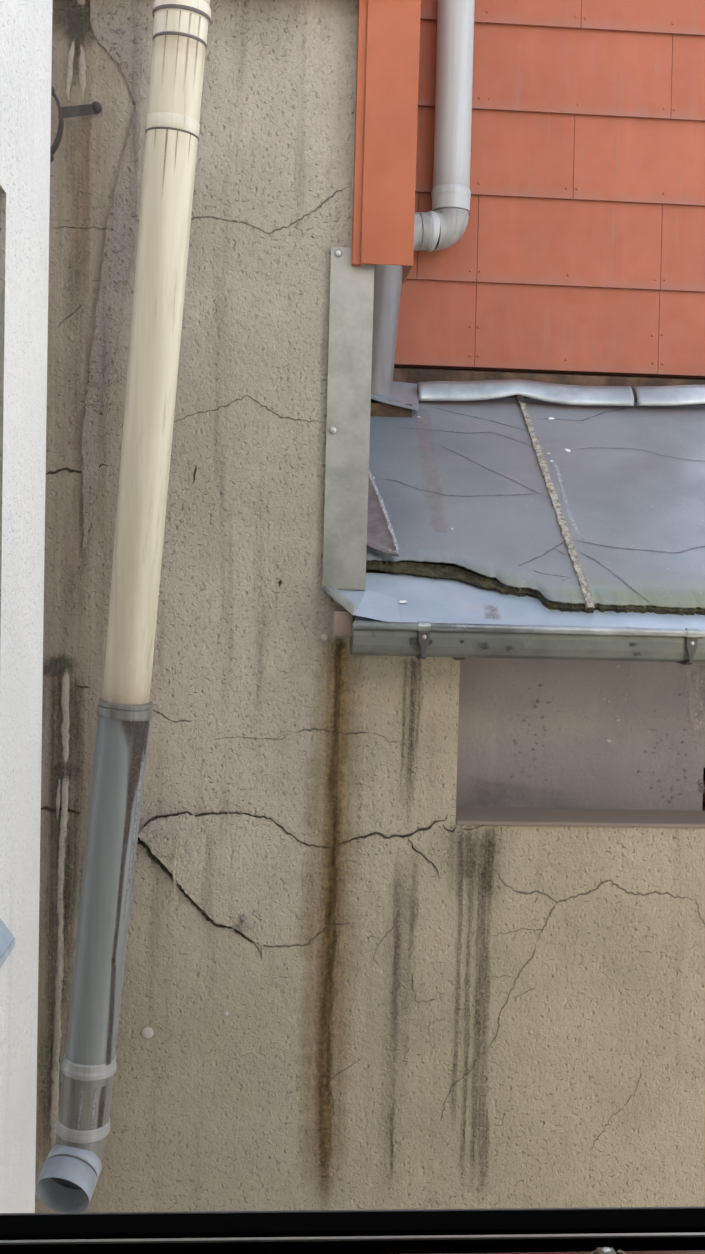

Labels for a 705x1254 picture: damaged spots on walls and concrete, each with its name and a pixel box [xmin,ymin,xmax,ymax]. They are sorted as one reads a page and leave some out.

leakage [66,10,86,100]
crack [191,187,347,234]
crack [176,395,322,423]
leakage [45,657,80,1148]
crack [141,811,485,968]
crack [395,972,436,1018]
leakage [452,829,496,1167]
crack [440,877,705,1121]
leakage [77,1086,105,1130]
crack [590,1074,642,1150]